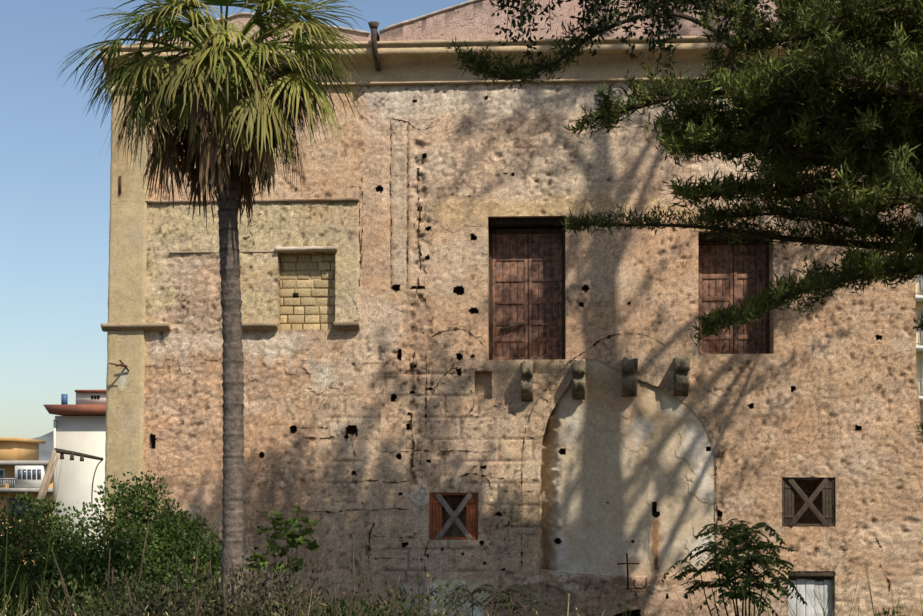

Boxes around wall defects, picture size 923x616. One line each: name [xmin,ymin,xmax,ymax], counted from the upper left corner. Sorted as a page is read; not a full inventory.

crack [302,117,667,573]
rust [649,518,663,573]